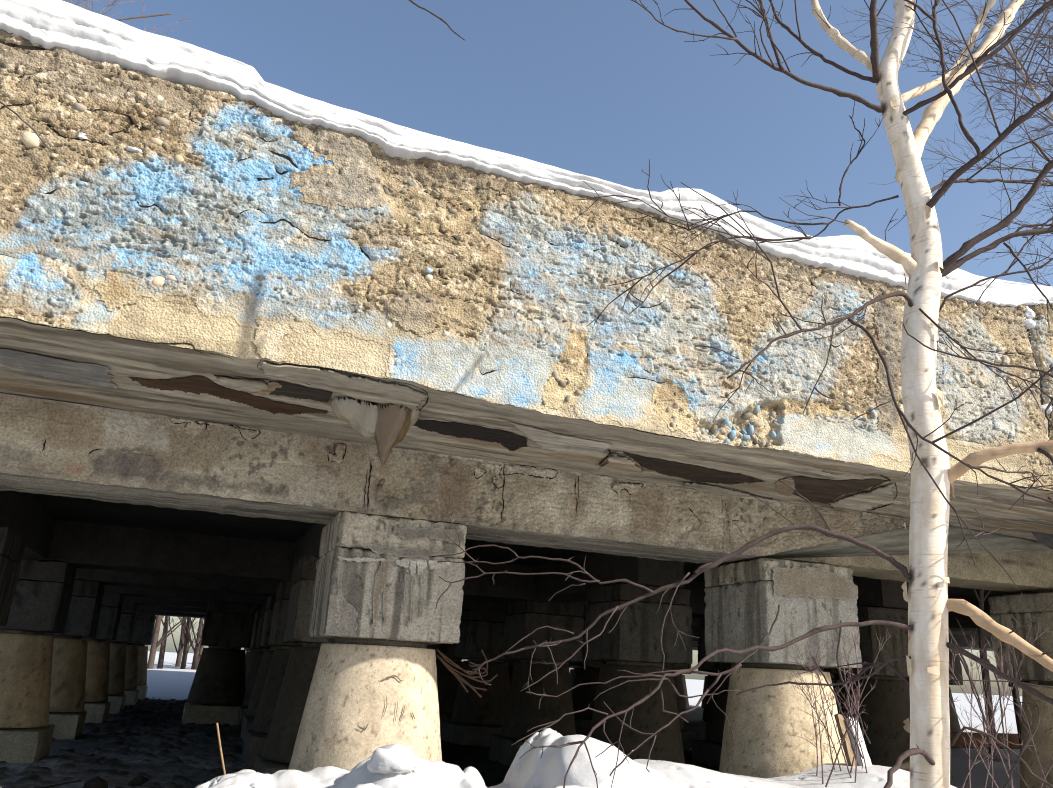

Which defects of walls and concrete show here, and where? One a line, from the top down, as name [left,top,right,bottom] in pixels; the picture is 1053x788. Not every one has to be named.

crack [230,137,298,181]
crack [237,209,370,259]
peeling [0,91,905,466]
water stain [370,455,474,514]
spalling [474,464,558,524]
spalling [599,451,777,548]
spalling [779,476,898,512]
water stain [325,576,358,637]
water stain [337,527,465,628]